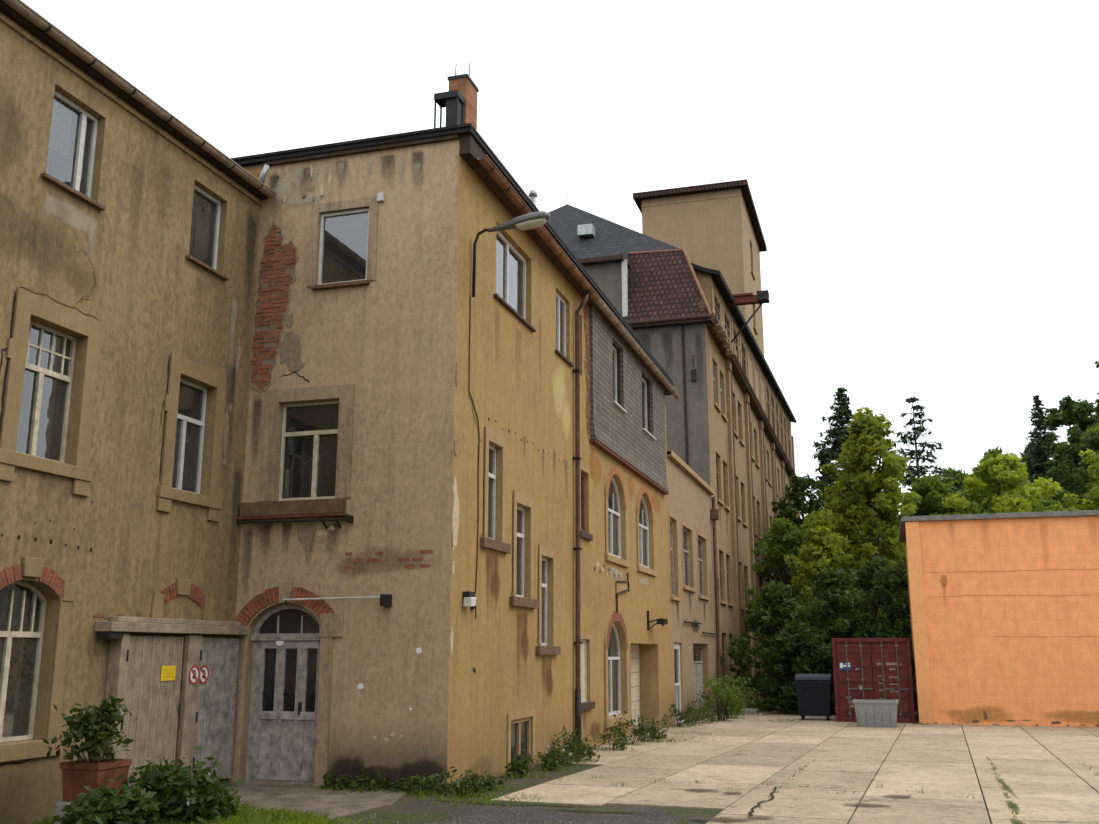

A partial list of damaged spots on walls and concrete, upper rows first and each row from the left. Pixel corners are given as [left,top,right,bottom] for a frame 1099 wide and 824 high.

crack [0,222,99,435]
flaking render [249,221,304,392]